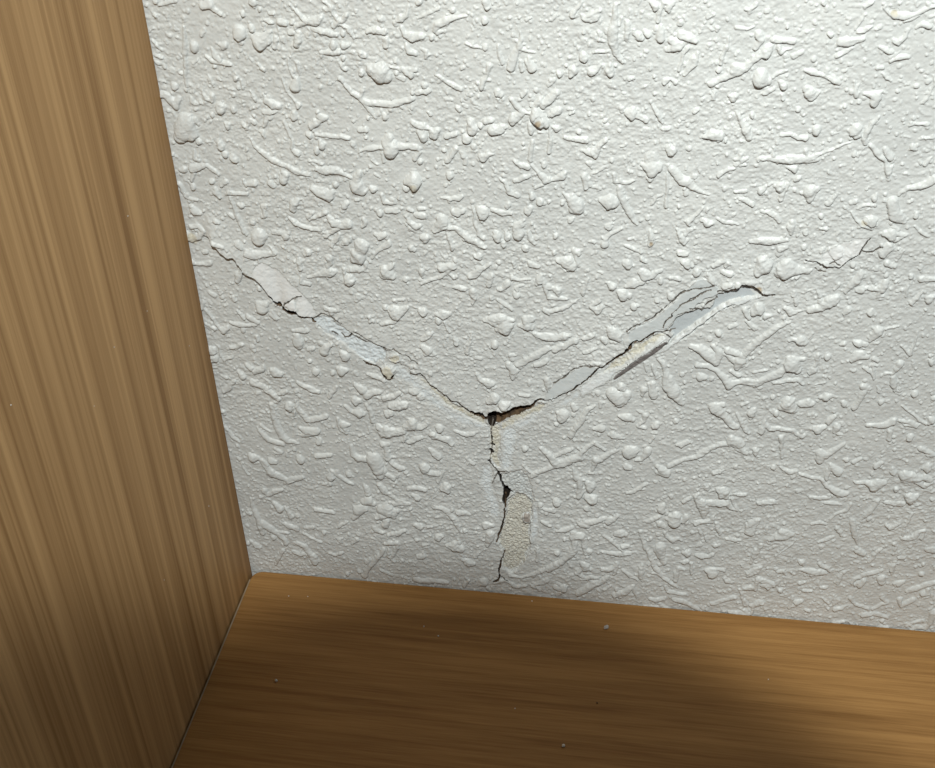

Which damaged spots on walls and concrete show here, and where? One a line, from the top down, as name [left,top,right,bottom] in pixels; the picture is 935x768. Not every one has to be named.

crack [805,238,884,273]
crack [229,258,727,583]
spalling [251,262,761,572]